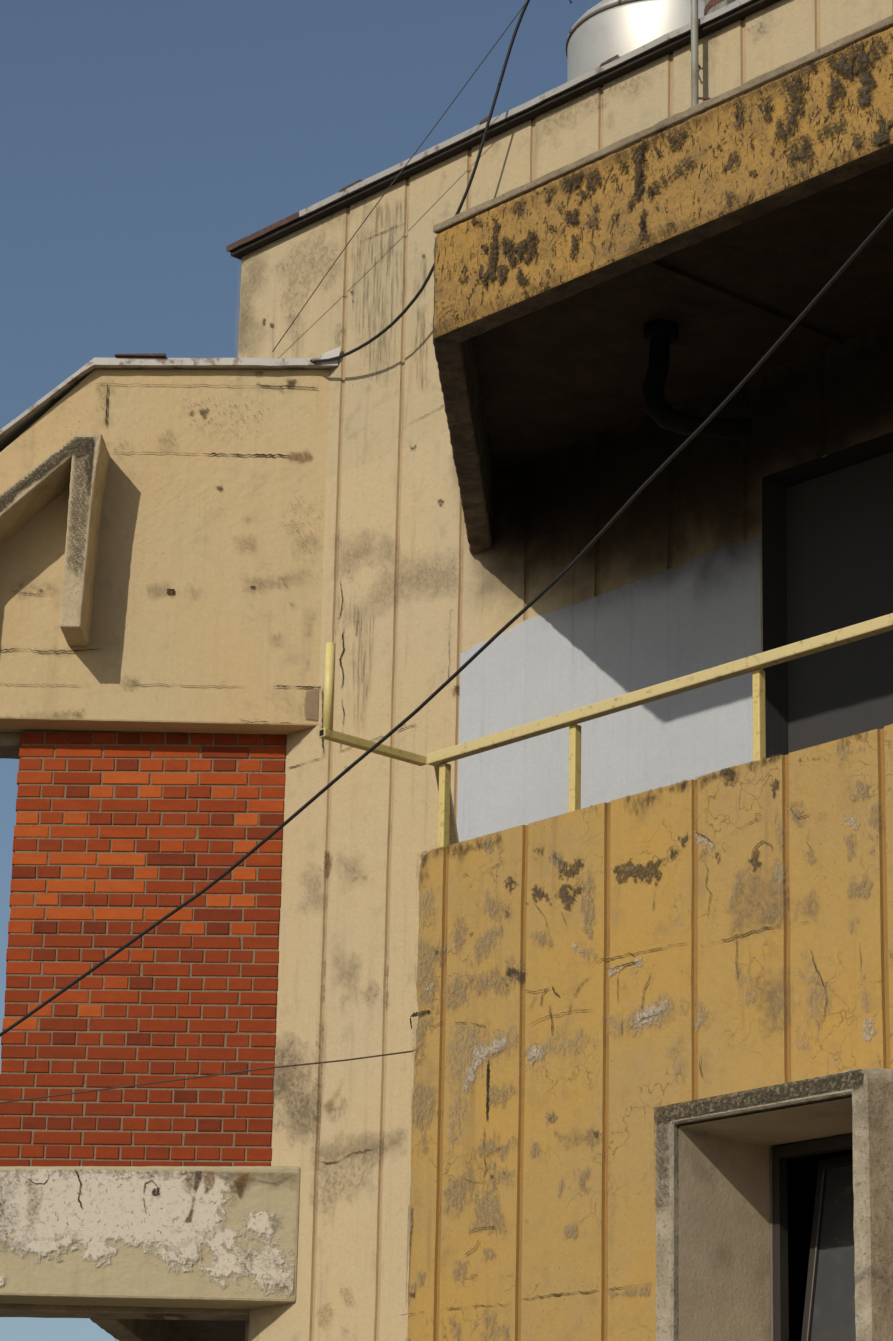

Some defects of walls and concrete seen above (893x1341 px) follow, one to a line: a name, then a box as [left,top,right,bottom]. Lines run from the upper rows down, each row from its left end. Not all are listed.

spalling [526,848,595,959]
spalling [613,828,720,917]
peeling [730,779,815,926]
peeling [411,897,588,1153]
crack [29,1169,83,1209]
peeling [0,1168,294,1297]